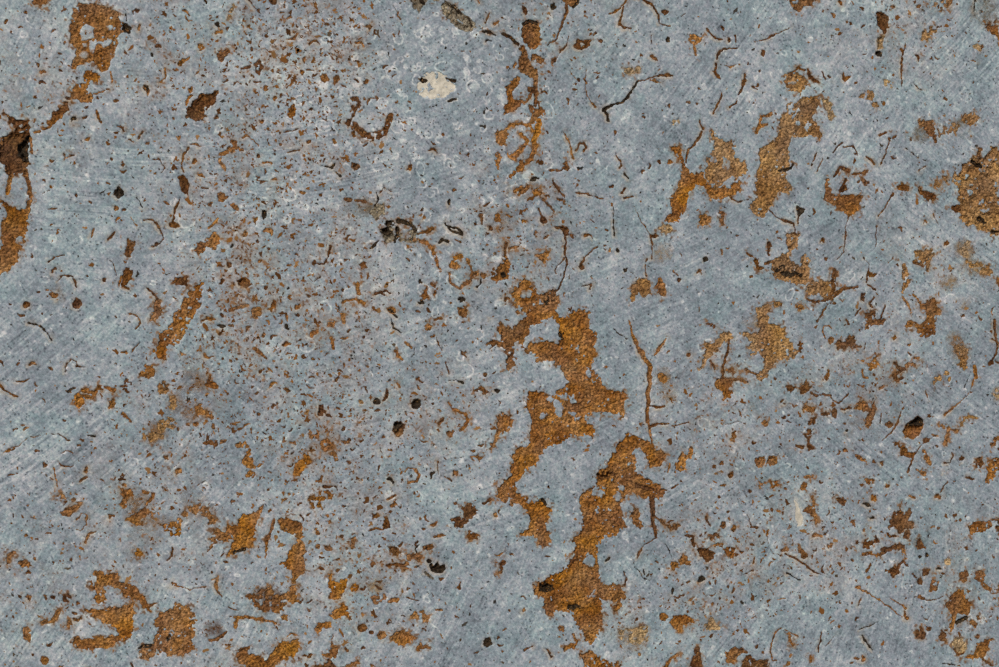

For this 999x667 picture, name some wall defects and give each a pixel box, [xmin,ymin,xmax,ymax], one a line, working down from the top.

spalling [0,2,141,274]
spalling [118,238,136,290]
spalling [190,140,244,214]
spalling [641,66,851,237]
spalling [897,147,999,236]
spalling [66,276,311,479]
spalling [281,425,356,476]
spalling [344,162,627,557]
spalling [697,302,832,451]
spalling [959,436,999,484]
spalling [23,570,198,661]
spalling [508,433,769,667]